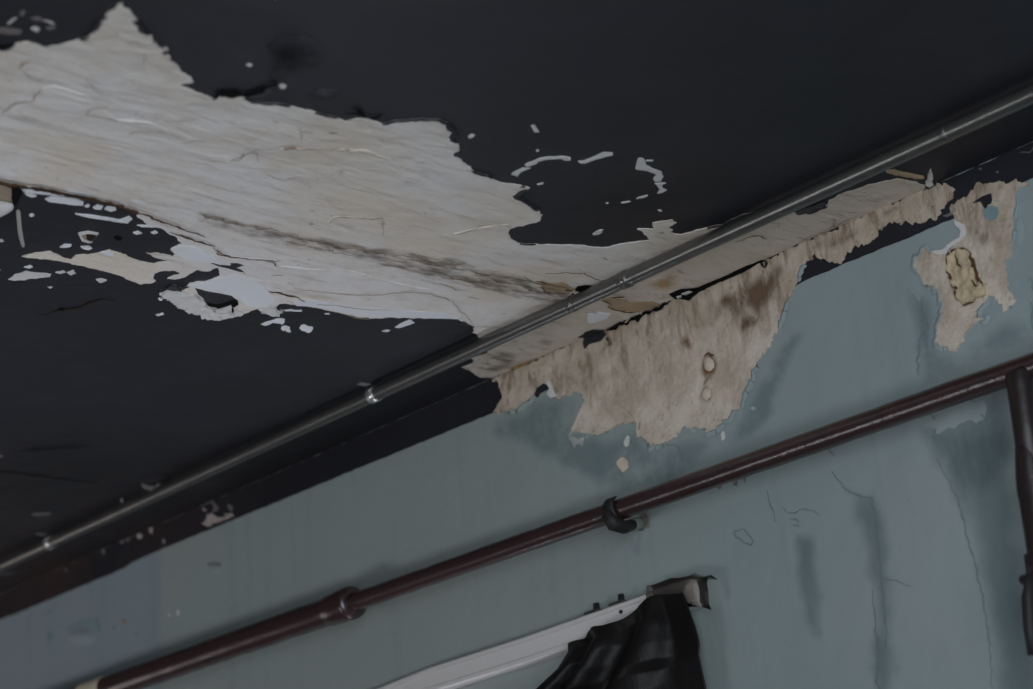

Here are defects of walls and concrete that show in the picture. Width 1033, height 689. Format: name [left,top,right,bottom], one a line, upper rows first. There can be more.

peeling [0,3,752,338]
peeling [462,168,1029,473]
peeling [202,495,234,527]
crack [828,449,911,689]
crack [931,414,993,689]